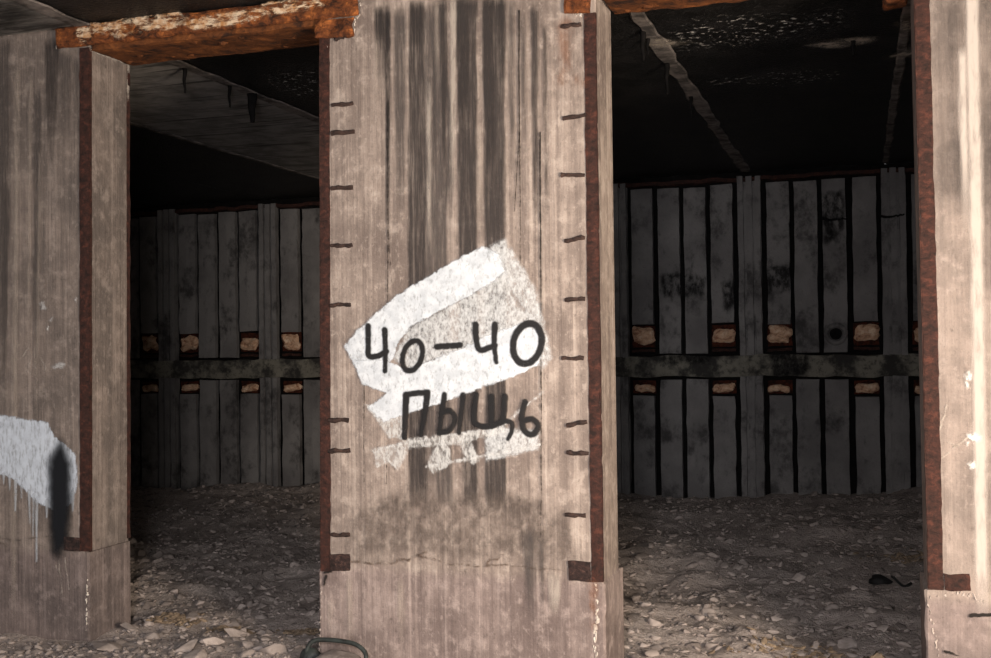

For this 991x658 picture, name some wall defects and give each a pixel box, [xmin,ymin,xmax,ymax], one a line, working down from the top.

water stain [375,1,547,349]
water stain [409,308,448,368]
water stain [409,400,451,494]
water stain [463,379,506,499]
water stain [524,535,543,588]
crack [969,611,991,619]